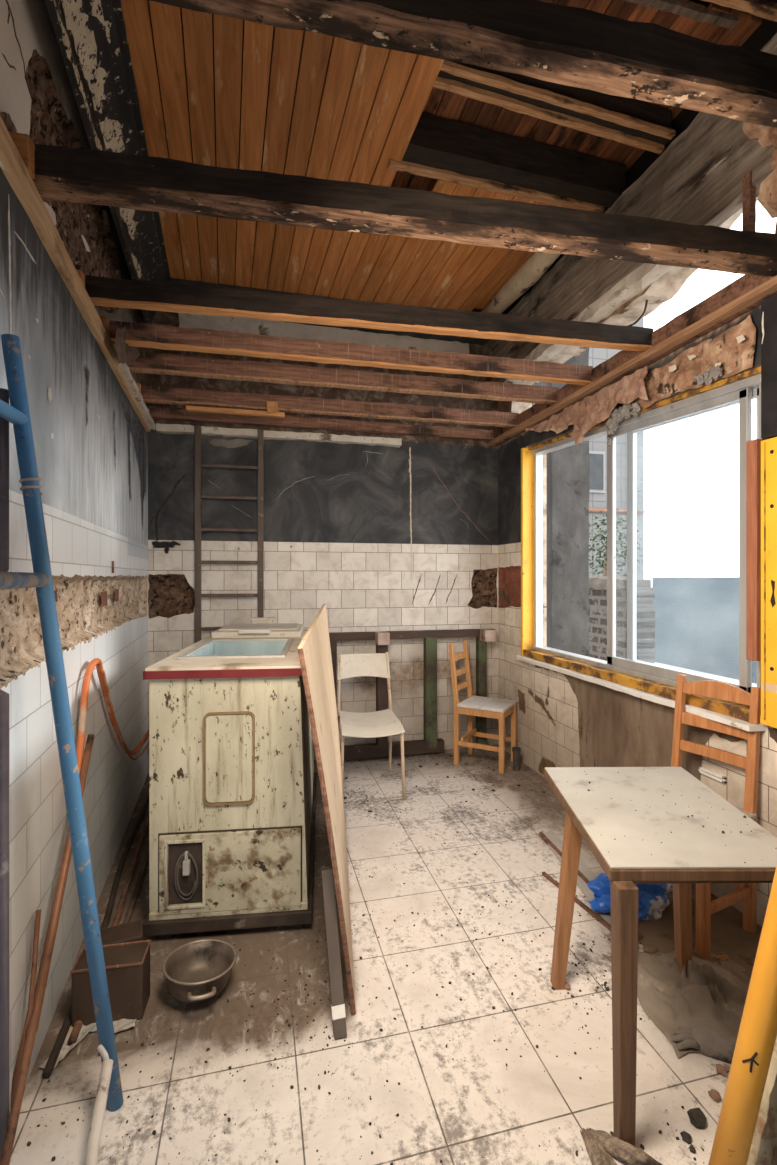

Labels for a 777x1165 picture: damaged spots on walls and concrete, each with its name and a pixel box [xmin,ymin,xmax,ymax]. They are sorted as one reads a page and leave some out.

flaking render [0,0,125,153]
flaking render [42,199,142,279]
flaking render [571,263,676,323]
flaking render [524,343,567,361]
flaking render [635,312,764,408]
spalling [0,587,46,689]
spalling [52,574,195,653]
spalling [468,566,521,609]